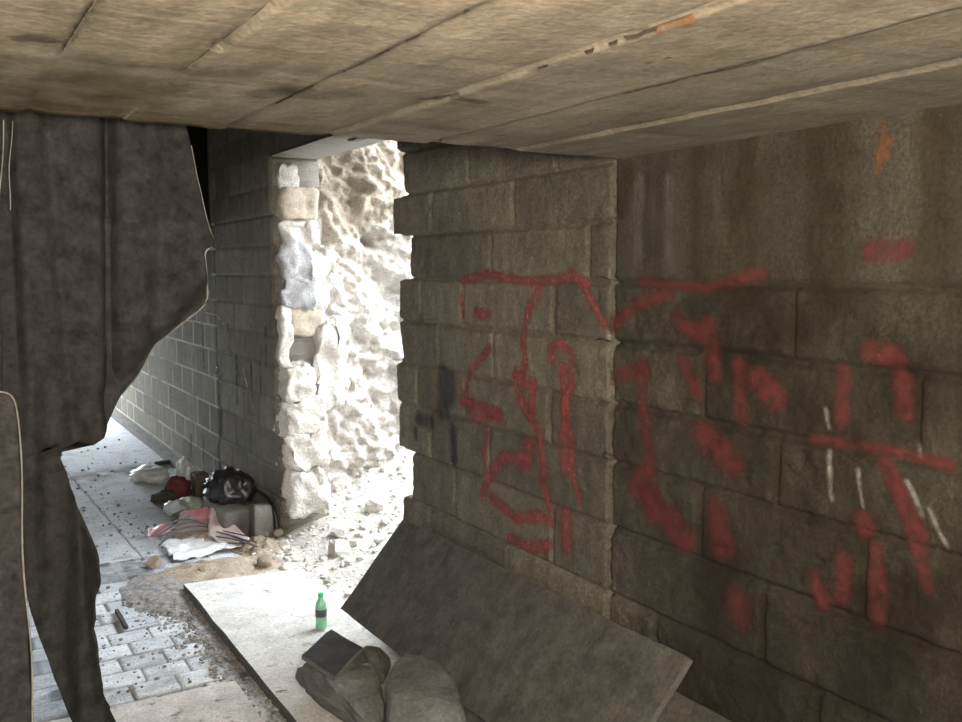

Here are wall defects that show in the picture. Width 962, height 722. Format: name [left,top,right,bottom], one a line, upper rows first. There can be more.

crack [575,28,657,54]
spalling [273,163,350,519]